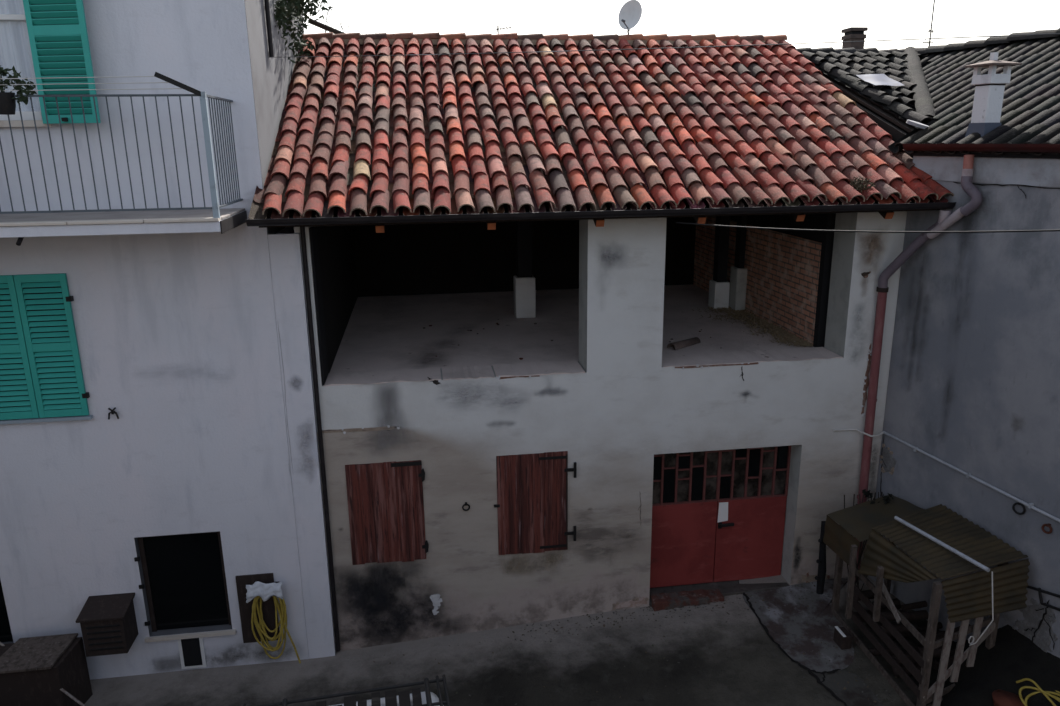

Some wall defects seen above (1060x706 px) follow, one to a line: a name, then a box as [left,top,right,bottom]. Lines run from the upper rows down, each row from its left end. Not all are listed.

spalling [1012,598,1058,653]